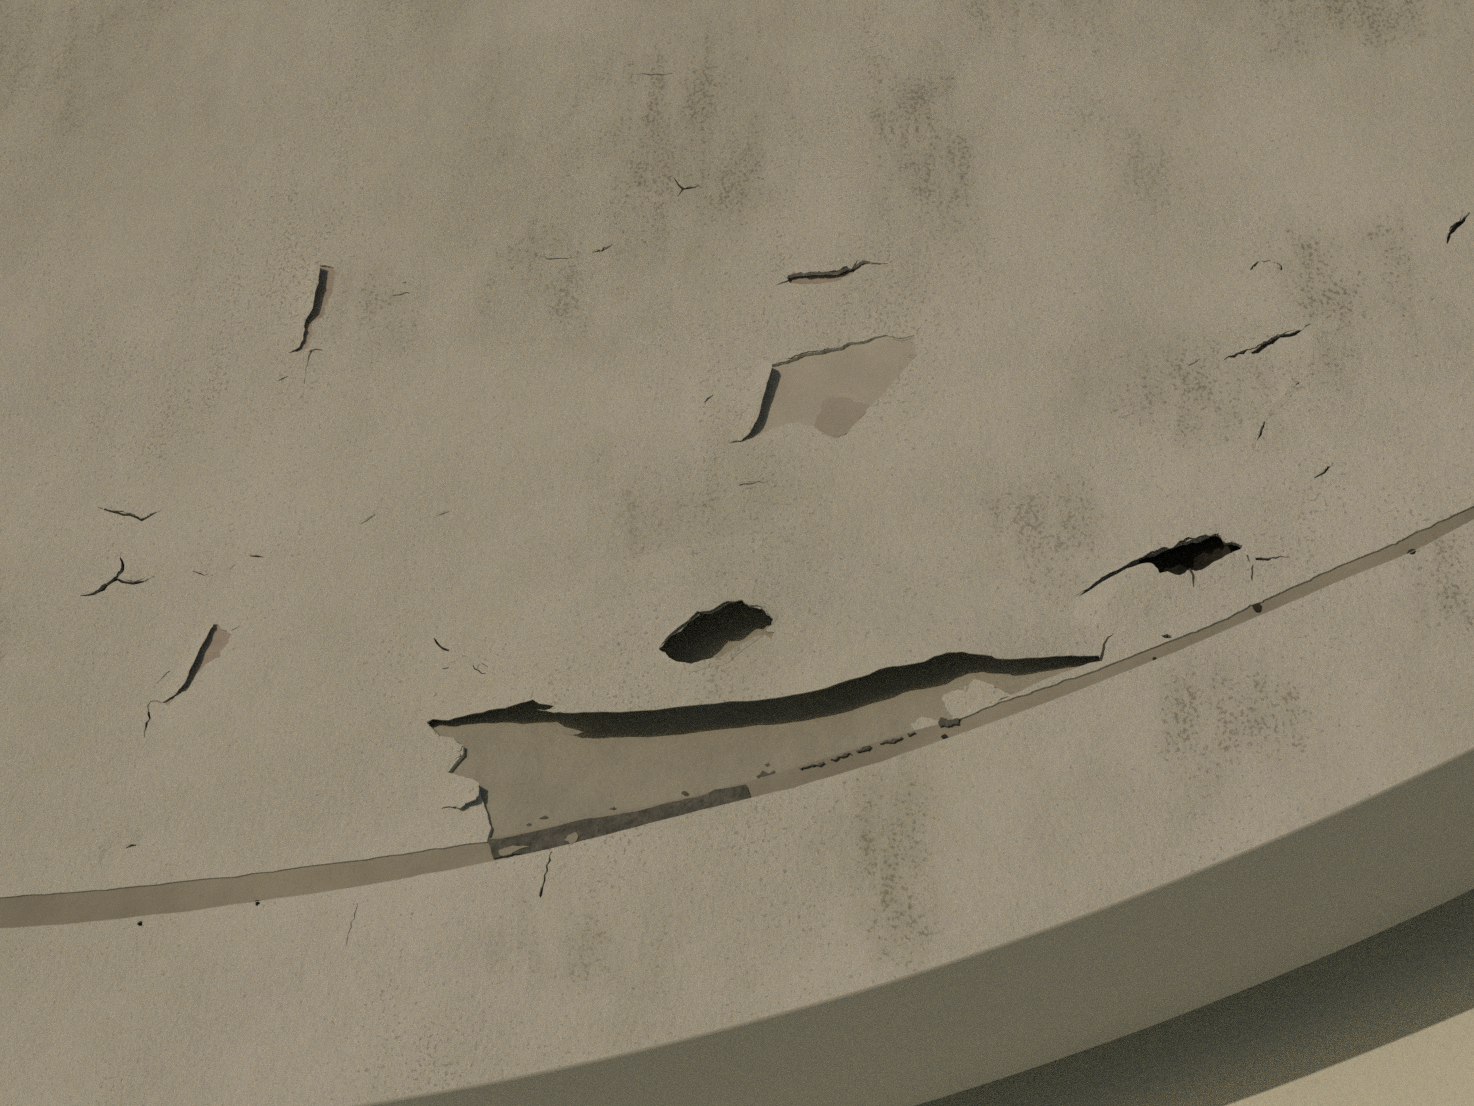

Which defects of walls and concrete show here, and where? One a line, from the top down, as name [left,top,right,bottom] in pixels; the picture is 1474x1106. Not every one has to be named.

peeling [283,257,335,357]
crack [1224,320,1309,358]
peeling [726,336,917,443]
crack [81,553,154,596]
crack [101,497,161,521]
spalling [1129,536,1241,575]
peeling [146,618,231,728]
peeling [410,521,1116,859]